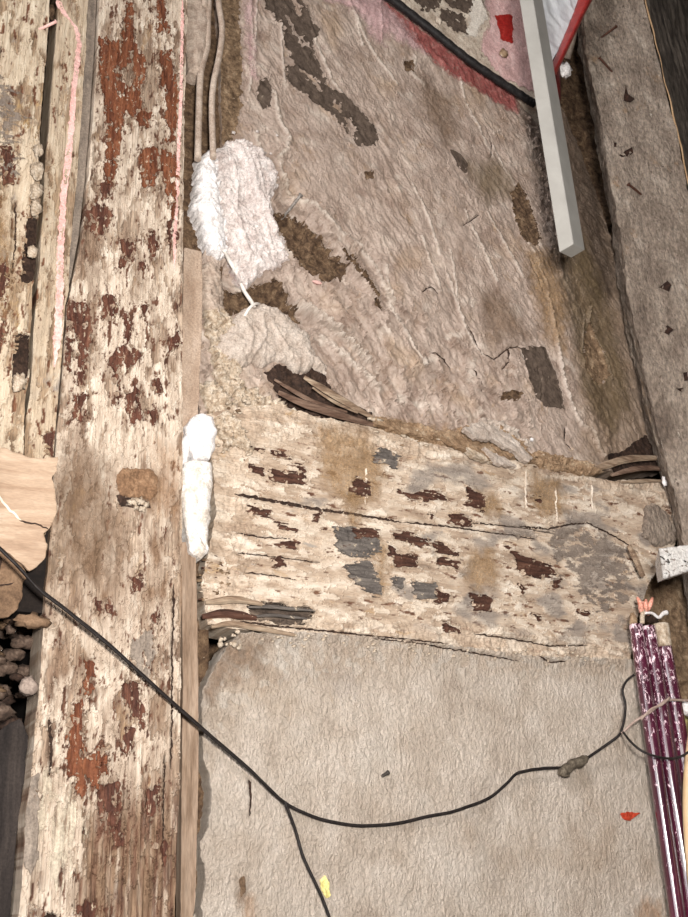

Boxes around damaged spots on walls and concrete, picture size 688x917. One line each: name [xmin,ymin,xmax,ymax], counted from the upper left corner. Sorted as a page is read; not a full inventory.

water stain [335,0,419,49]
peeling [85,0,171,237]
peeling [118,49,181,272]
spalling [0,216,37,379]
peeling [65,294,164,426]
spalling [199,364,657,485]
spalling [500,343,565,409]
crack [237,533,320,580]
peeling [332,526,462,604]
crack [235,493,629,545]
peeling [504,541,563,597]
peeling [62,613,161,847]